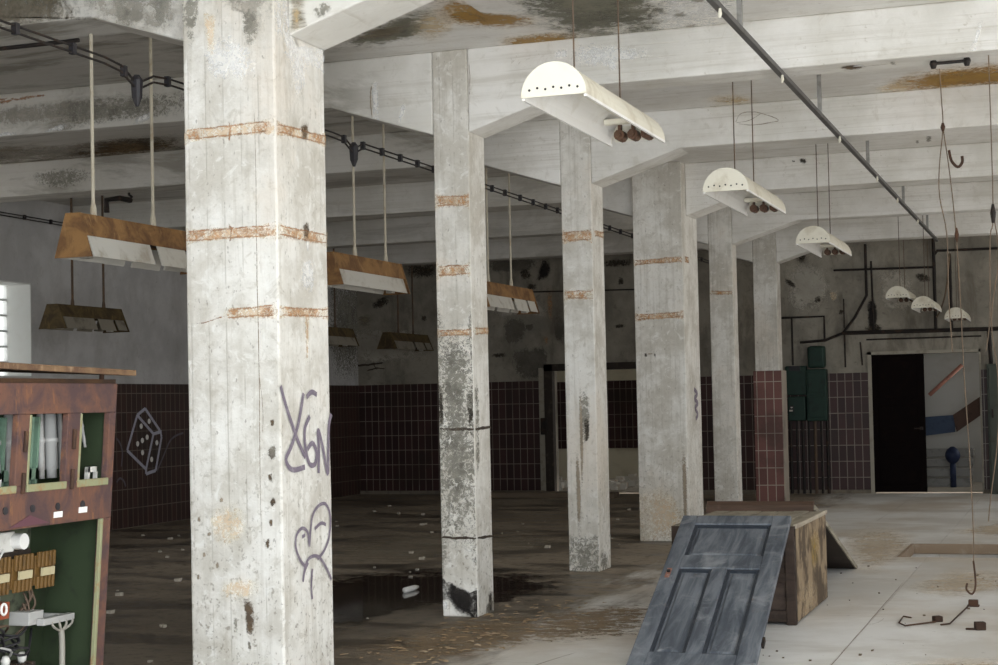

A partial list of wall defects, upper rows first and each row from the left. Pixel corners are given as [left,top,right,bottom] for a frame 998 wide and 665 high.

damp [353,0,663,45]
damp [0,95,184,136]
rust [187,121,325,144]
damp [0,137,184,187]
rust [187,225,327,243]
damp [332,312,480,572]